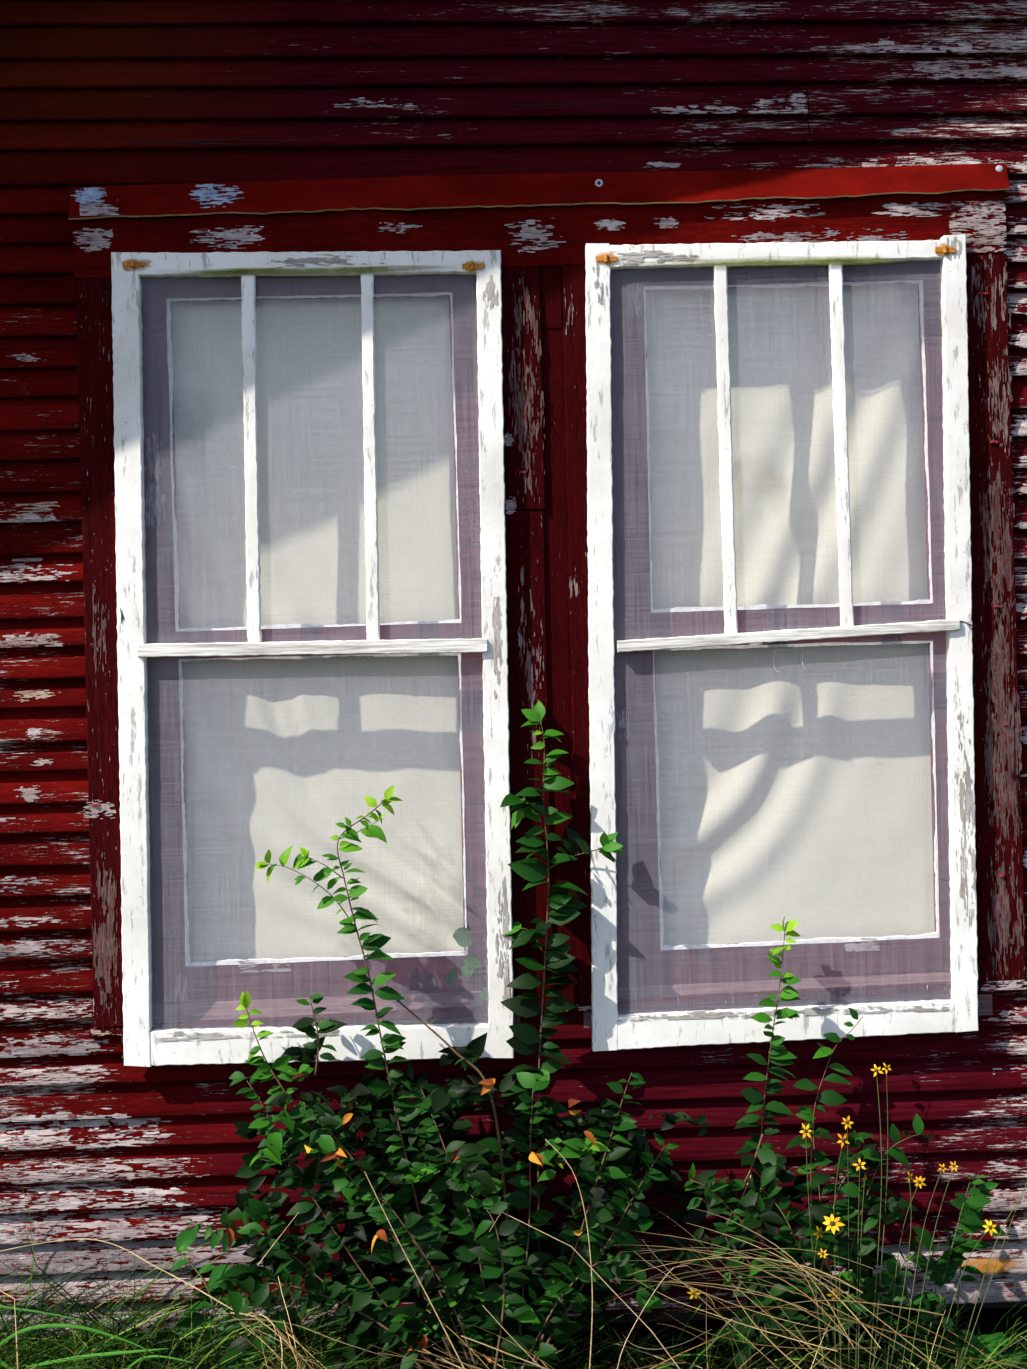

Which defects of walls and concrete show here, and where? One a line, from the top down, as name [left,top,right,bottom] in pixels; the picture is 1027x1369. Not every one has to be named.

peeling [854,37,1027,79]
peeling [650,93,808,132]
peeling [189,184,243,208]
peeling [190,225,265,249]
peeling [0,501,59,523]
peeling [0,558,72,583]
peeling [704,153,1027,1046]
peeling [0,632,63,648]
peeling [491,559,544,774]
peeling [14,690,60,702]
peeling [83,800,116,819]
peeling [867,1141,1027,1306]